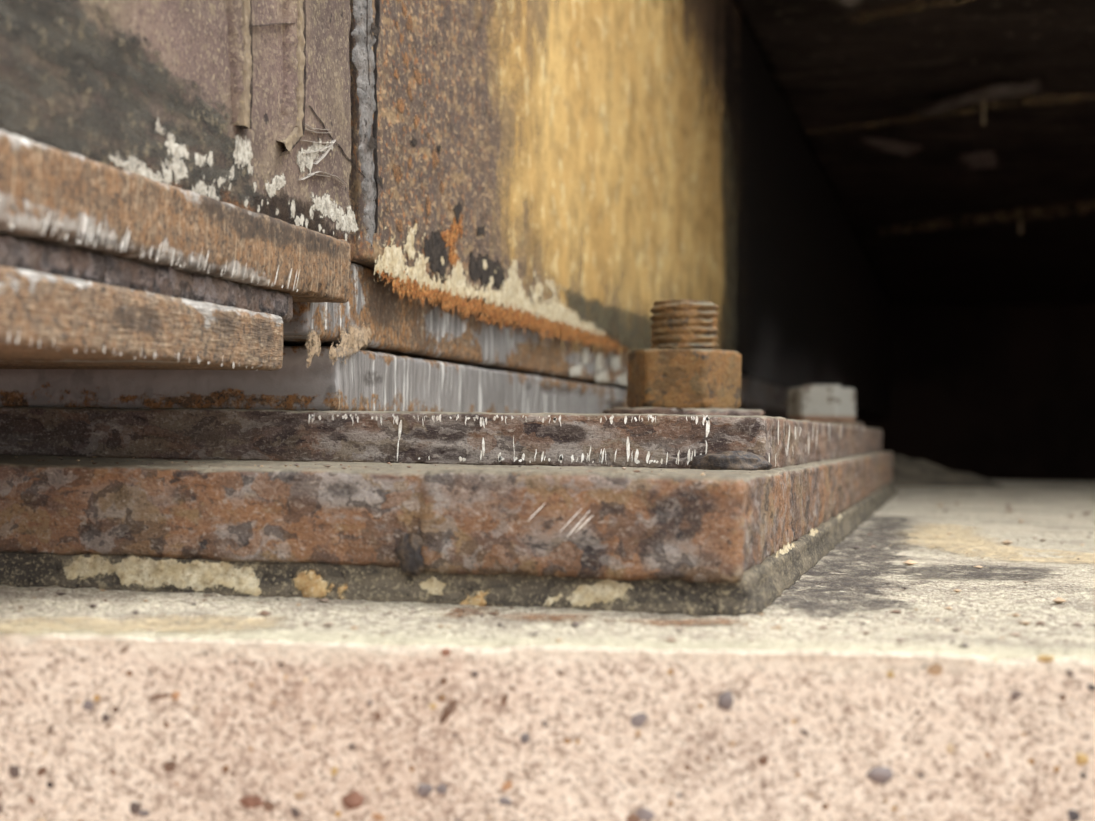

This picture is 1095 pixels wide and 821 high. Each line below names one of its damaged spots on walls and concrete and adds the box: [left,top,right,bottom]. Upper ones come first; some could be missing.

leakage [0,0,360,241]
crack [310,0,383,247]
spalling [424,230,449,281]
spalling [469,252,505,289]
corrosion [376,182,626,354]
leakage [374,0,737,351]
corrosion [689,451,772,471]
corrosion [395,533,425,576]